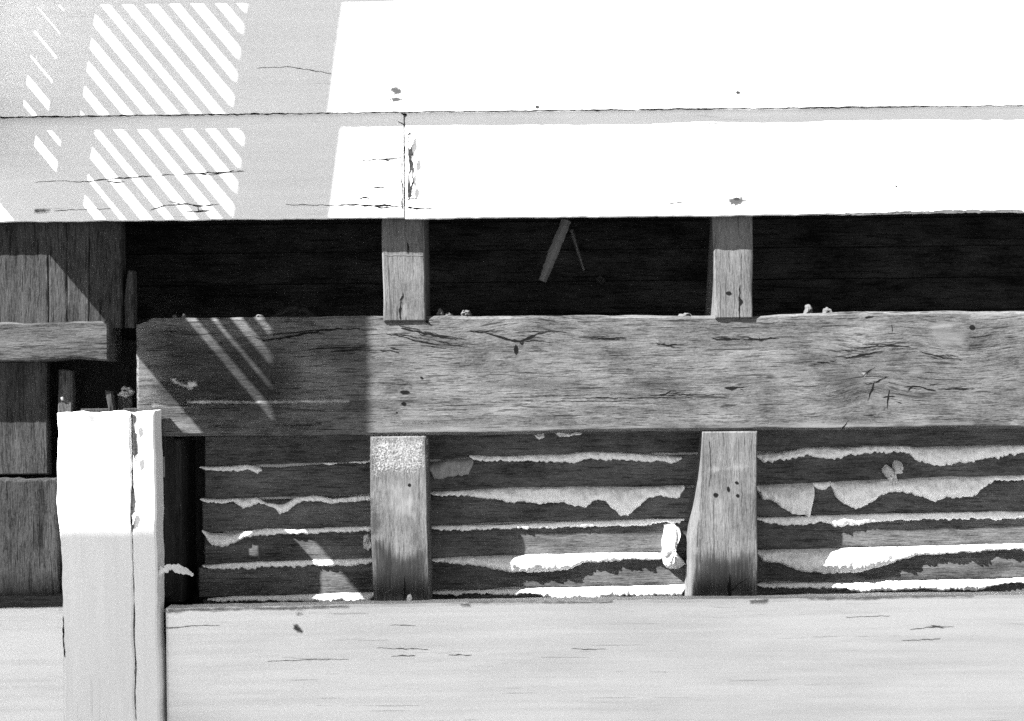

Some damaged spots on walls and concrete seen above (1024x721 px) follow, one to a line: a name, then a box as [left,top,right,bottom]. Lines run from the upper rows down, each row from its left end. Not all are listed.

crack [255,320,558,353]
crack [810,316,971,409]
crack [129,413,137,719]